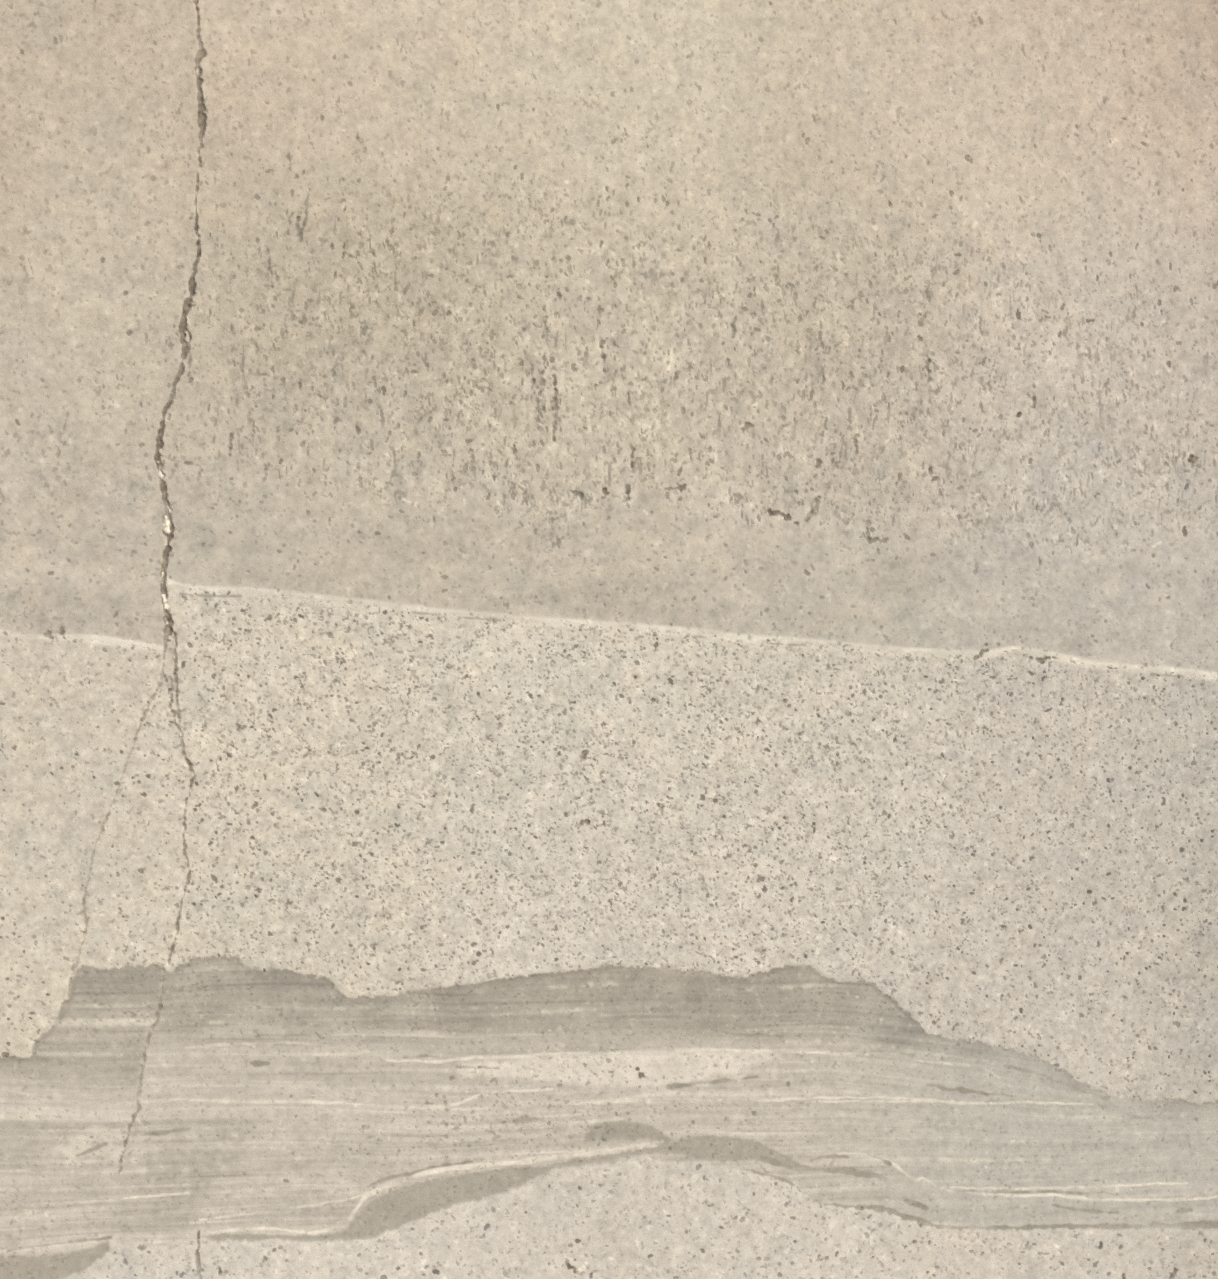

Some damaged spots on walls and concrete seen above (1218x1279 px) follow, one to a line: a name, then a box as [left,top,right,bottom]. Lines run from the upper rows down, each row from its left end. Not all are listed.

crack [68,0,208,1175]
crack [195,1231,203,1279]